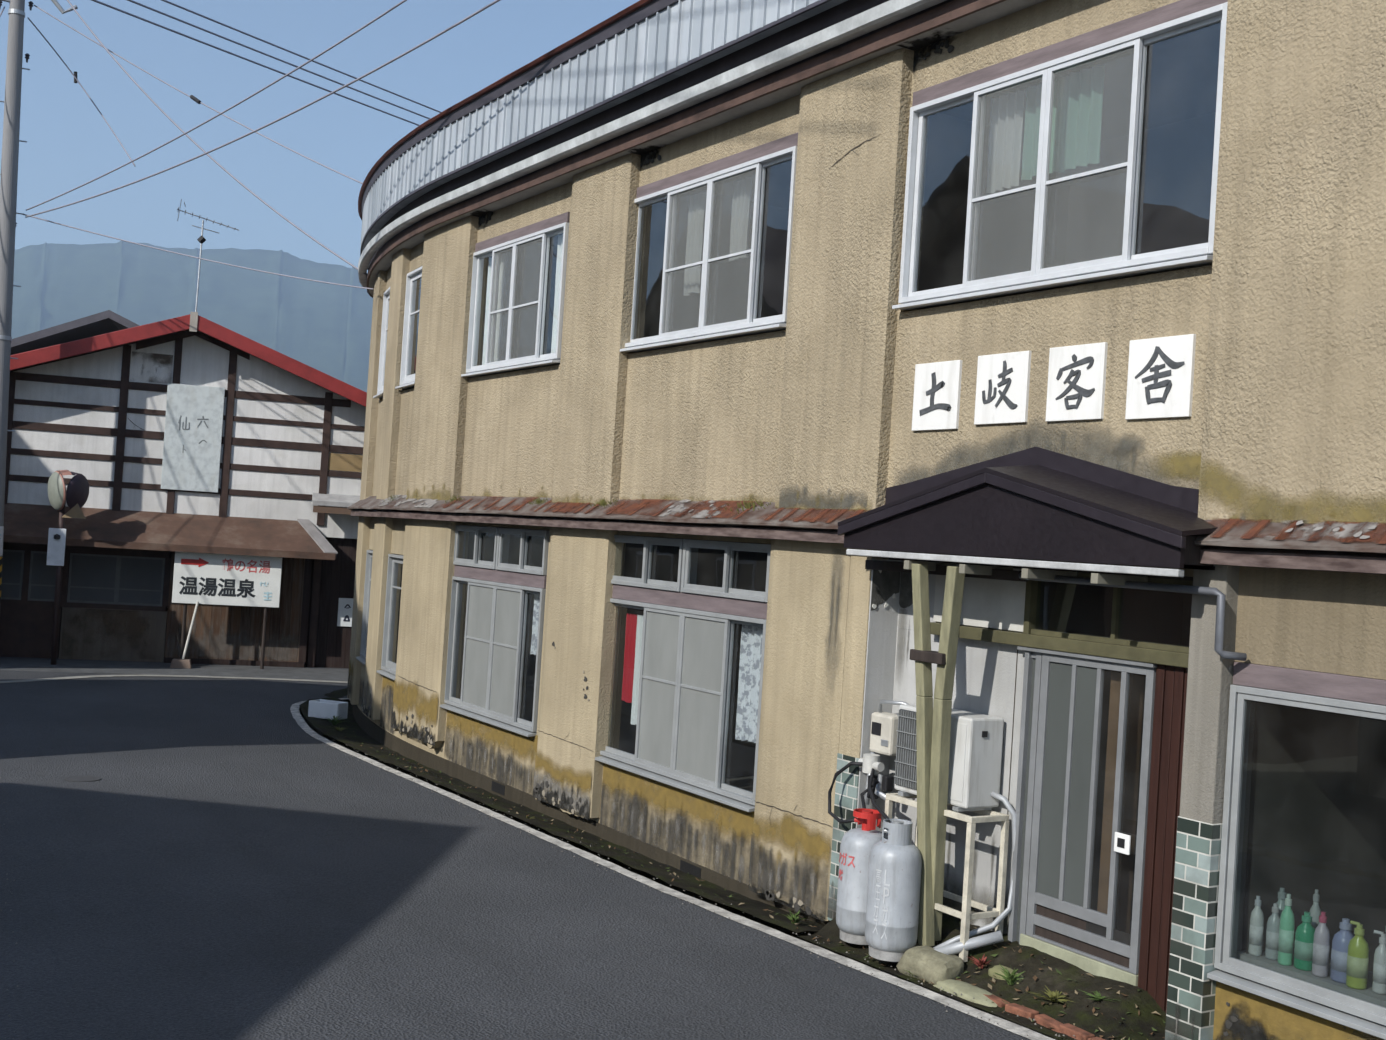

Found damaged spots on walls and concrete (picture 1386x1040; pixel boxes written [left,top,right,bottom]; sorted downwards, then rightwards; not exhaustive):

damp [901,430,1164,484]
rust [443,496,865,523]
rust [1211,518,1386,544]
damp [347,679,427,734]
damp [444,734,837,919]
damp [1218,1002,1275,1040]